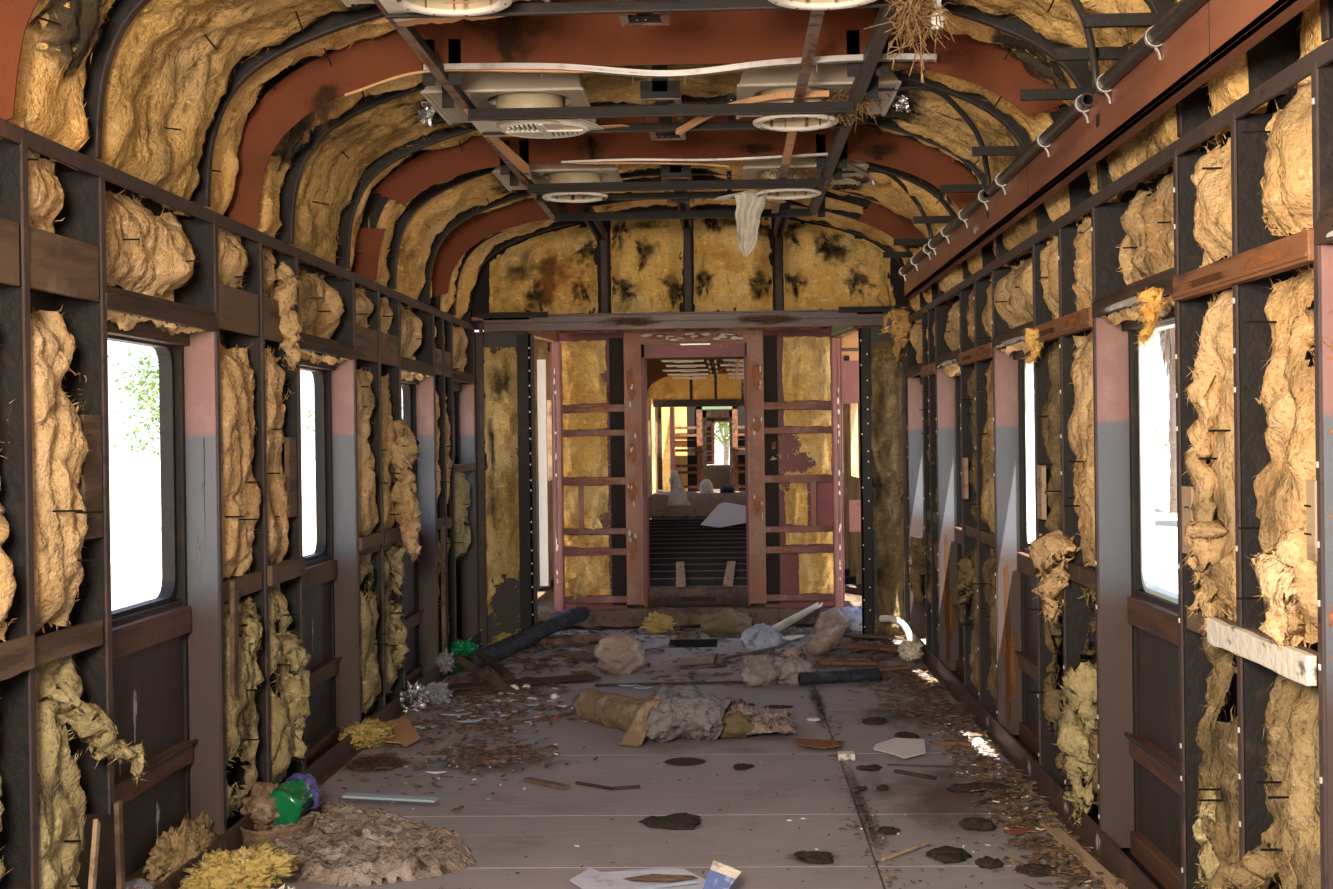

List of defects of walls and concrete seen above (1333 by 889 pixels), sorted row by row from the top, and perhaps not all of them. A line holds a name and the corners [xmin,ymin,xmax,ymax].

water stain [525,241,596,311]
peeling [1104,296,1140,312]
peeling [1188,272,1223,288]
peeling [937,316,1079,368]